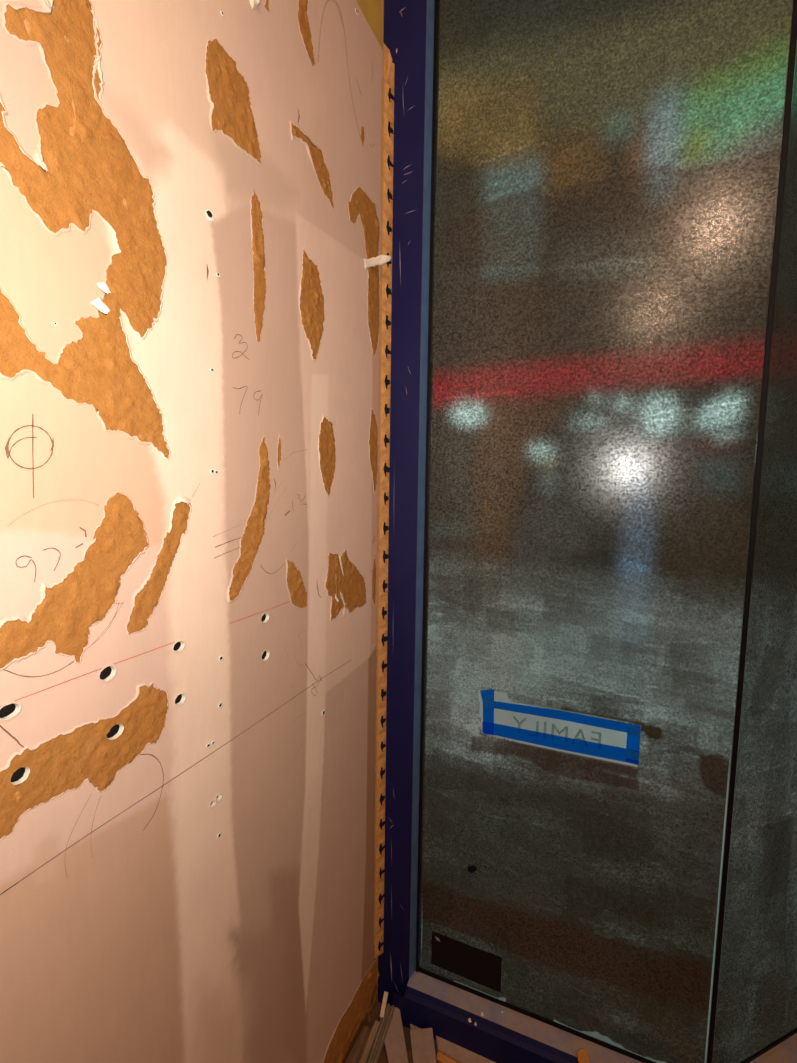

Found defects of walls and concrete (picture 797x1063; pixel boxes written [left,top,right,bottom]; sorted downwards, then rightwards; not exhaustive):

peeling [297,0,315,67]
peeling [0,0,171,460]
peeling [204,38,262,167]
peeling [298,247,325,361]
peeling [290,121,334,211]
peeling [348,186,380,357]
peeling [0,491,192,671]
peeling [227,432,282,603]
peeling [285,558,308,610]
peeling [317,415,336,497]
peeling [324,549,376,622]
peeling [0,681,186,841]